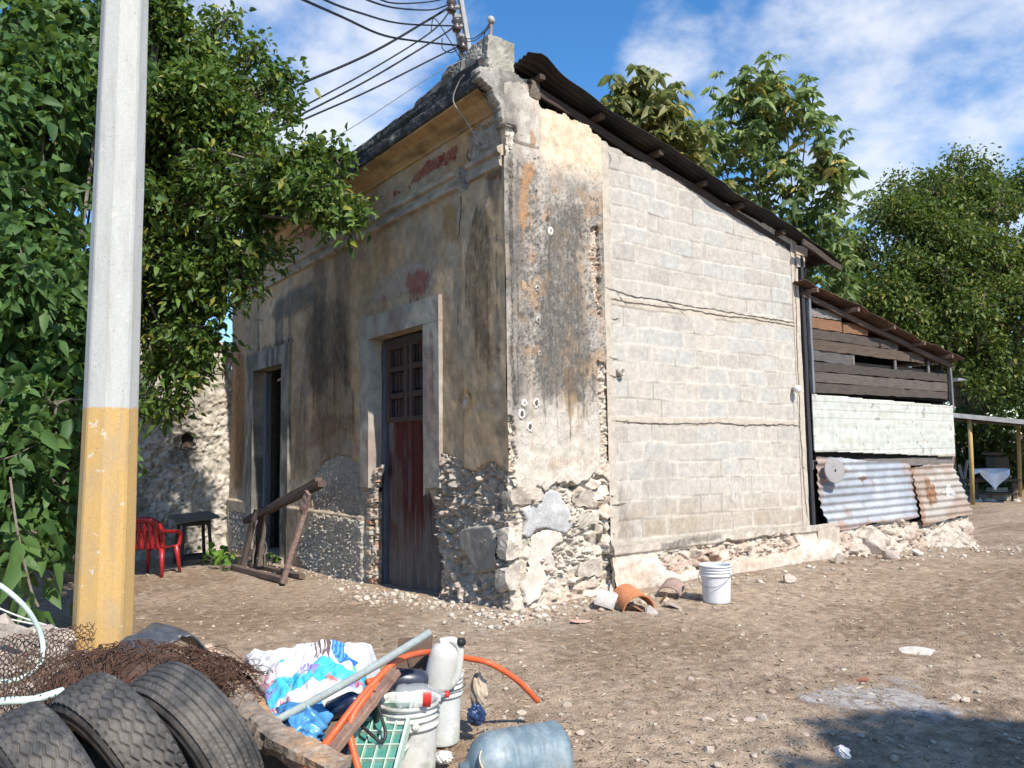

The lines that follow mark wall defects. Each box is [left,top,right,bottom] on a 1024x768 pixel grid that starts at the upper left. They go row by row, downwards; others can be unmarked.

leakage [509,160,534,265]
leakage [539,209,594,404]
flaking render [588,227,601,318]
crack [605,260,808,517]
flaking render [297,454,385,584]
flaking render [434,363,615,610]
spalling [657,533,799,574]
corrosion [925,478,939,504]